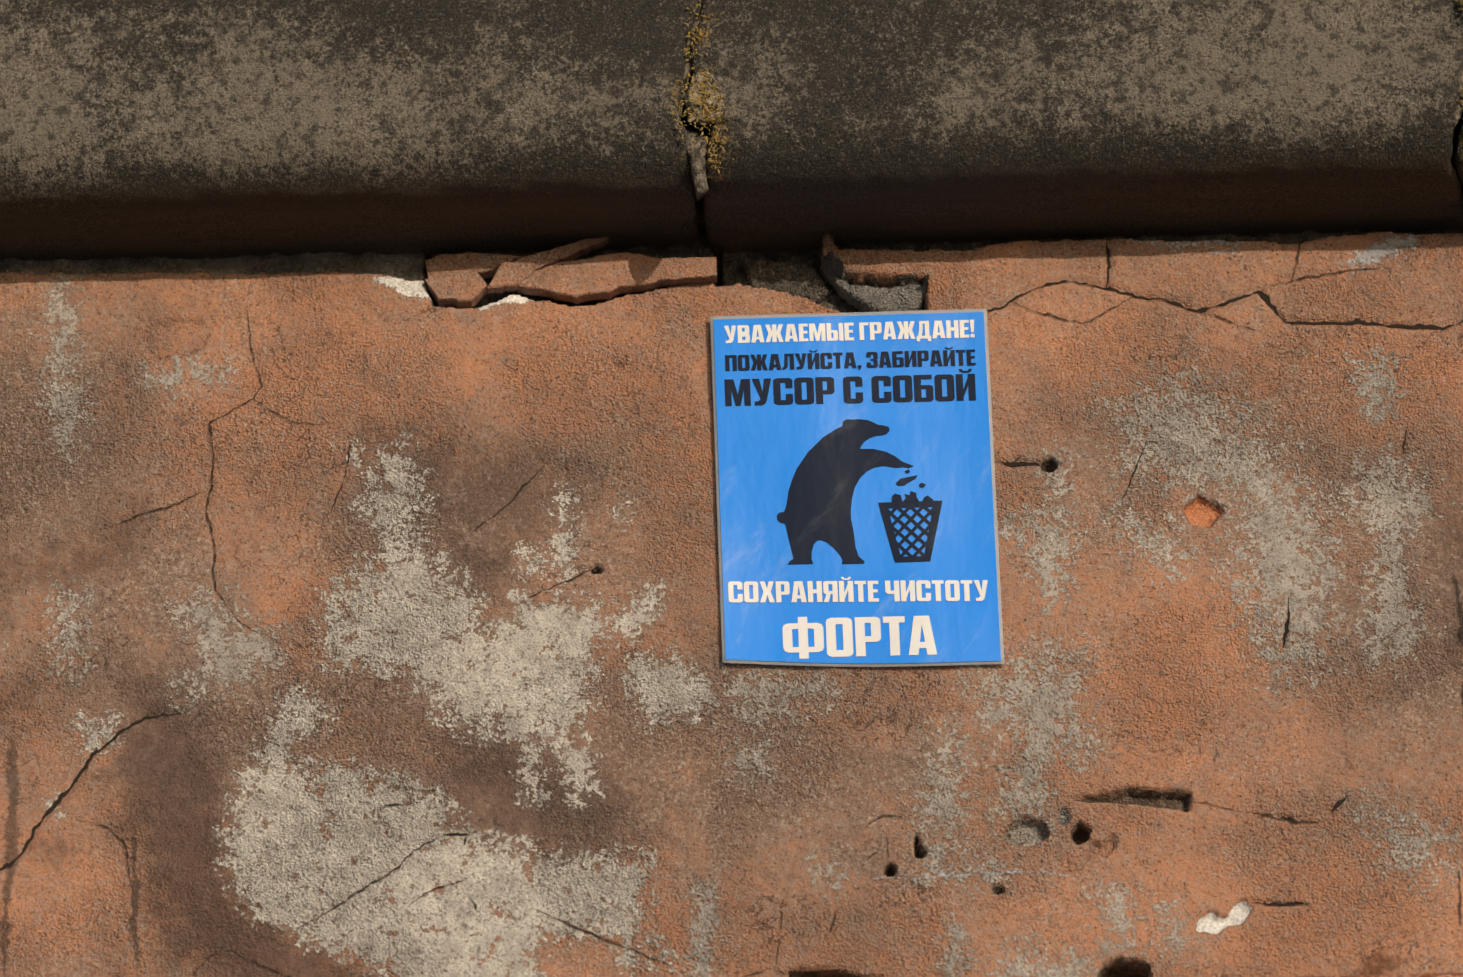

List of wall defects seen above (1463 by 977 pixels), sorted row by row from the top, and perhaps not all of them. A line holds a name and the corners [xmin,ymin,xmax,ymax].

spalling [0,224,1462,476]
crack [987,242,1463,330]
crack [112,281,353,634]
peeling [27,574,107,691]
crack [0,712,181,895]
peeling [65,708,127,763]
damp [120,702,353,977]
peeling [153,429,856,977]
crack [528,567,601,599]
peeling [798,334,1463,977]
damp [1452,578,1463,642]
rust [1354,953,1399,975]